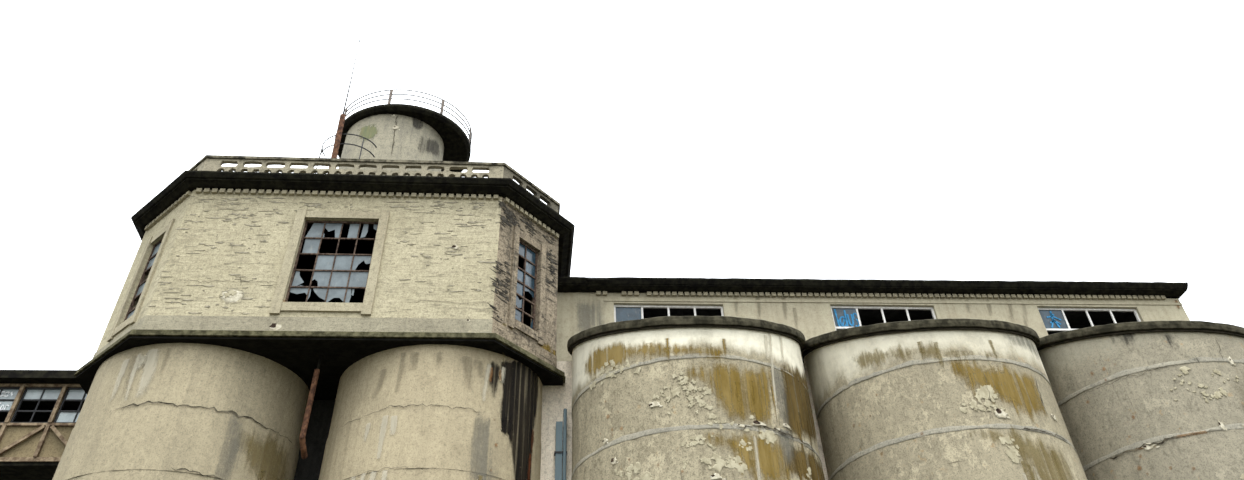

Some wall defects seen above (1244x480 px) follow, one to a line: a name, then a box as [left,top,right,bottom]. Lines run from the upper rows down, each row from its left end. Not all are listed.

water stain [473,360,538,480]
peeling [602,438,654,480]
water stain [585,333,825,480]
peeling [649,371,791,480]
water stain [857,340,1072,480]
spalling [959,385,1010,419]
peeling [999,436,1020,464]
crack [1106,429,1222,460]